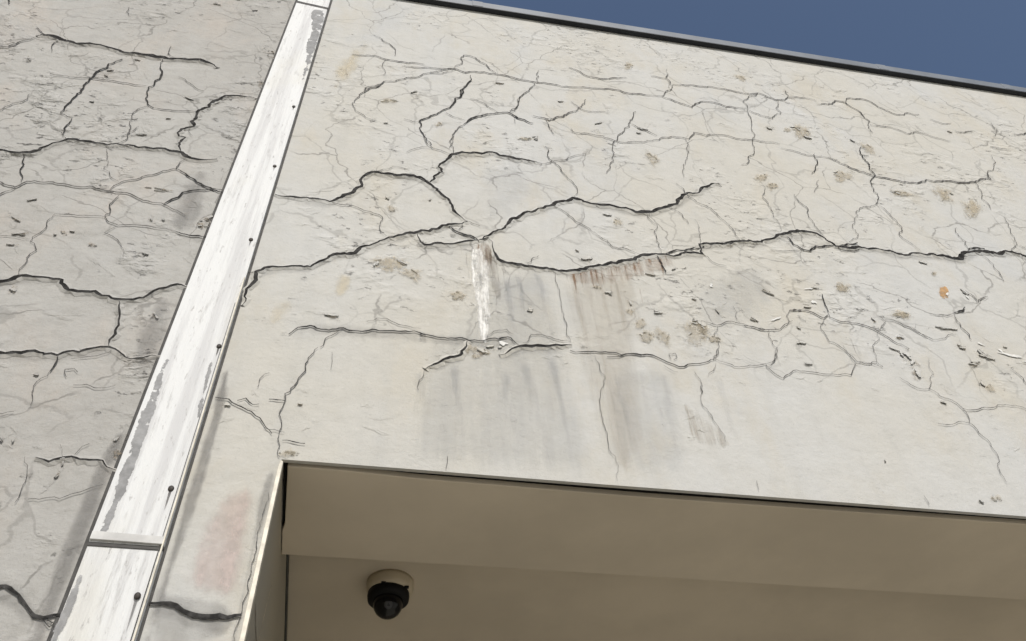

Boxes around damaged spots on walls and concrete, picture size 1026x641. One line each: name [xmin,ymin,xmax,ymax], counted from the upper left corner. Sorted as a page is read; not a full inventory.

crack [0,27,256,414]
damp [471,249,490,342]
crack [215,35,1026,481]
peeling [575,249,742,360]
crack [15,444,117,502]
crack [0,584,61,627]
crack [149,601,257,641]